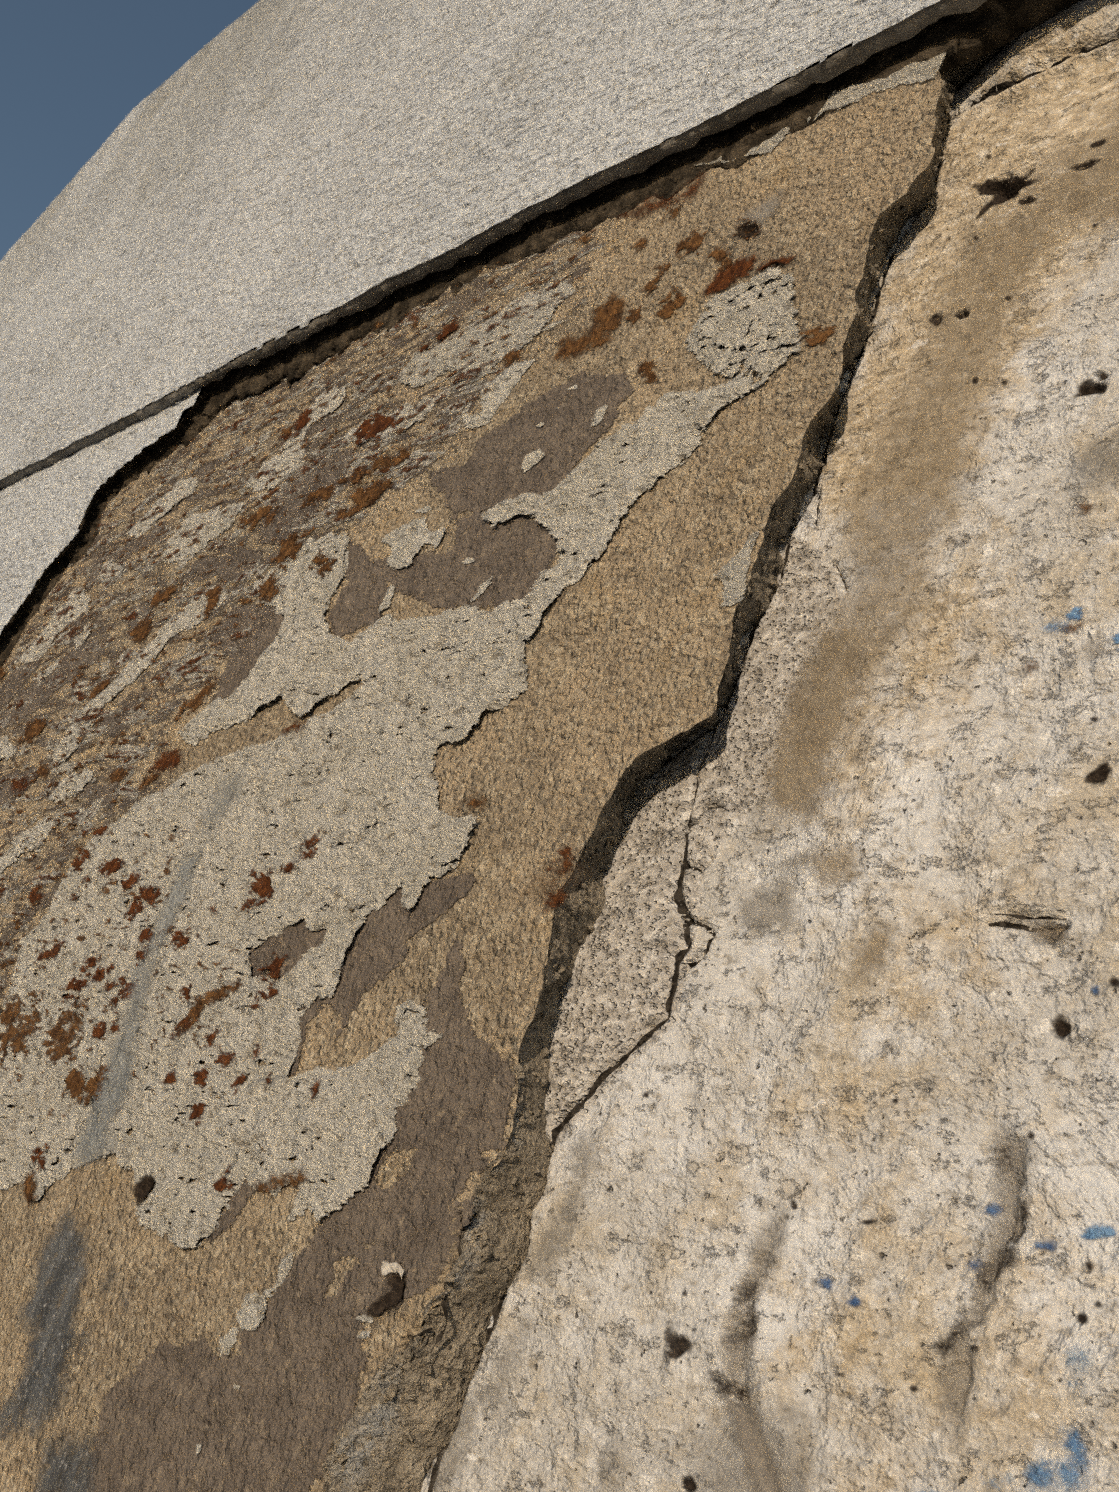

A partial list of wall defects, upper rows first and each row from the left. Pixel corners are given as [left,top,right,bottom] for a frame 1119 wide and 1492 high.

crack [951,38,1119,120]
peeling [528,240,606,281]
rust [554,217,796,361]
crack [781,215,919,580]
rust [0,231,603,1129]
crack [551,728,725,1146]
crack [988,913,1068,942]
peeling [422,1055,477,1084]
peeling [421,1078,478,1126]
rust [23,1143,49,1205]
rust [213,1165,234,1191]
crack [485,1296,506,1344]